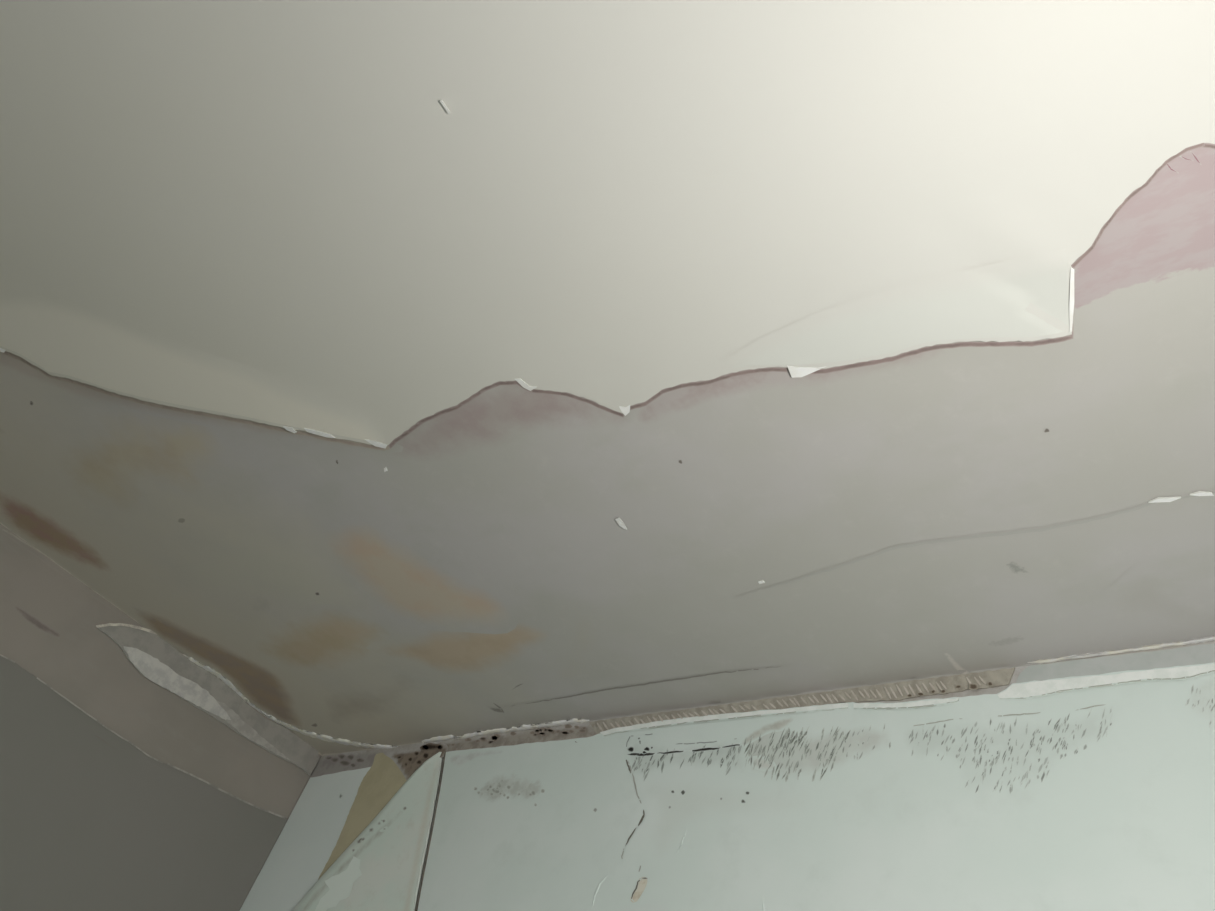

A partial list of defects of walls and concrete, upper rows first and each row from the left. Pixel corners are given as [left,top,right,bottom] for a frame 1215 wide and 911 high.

leakage [0,289,386,443]
leakage [632,143,1215,427]
peeling [0,143,1215,819]
crack [734,491,1215,598]
peeling [292,752,442,911]
leakage [625,697,1138,868]